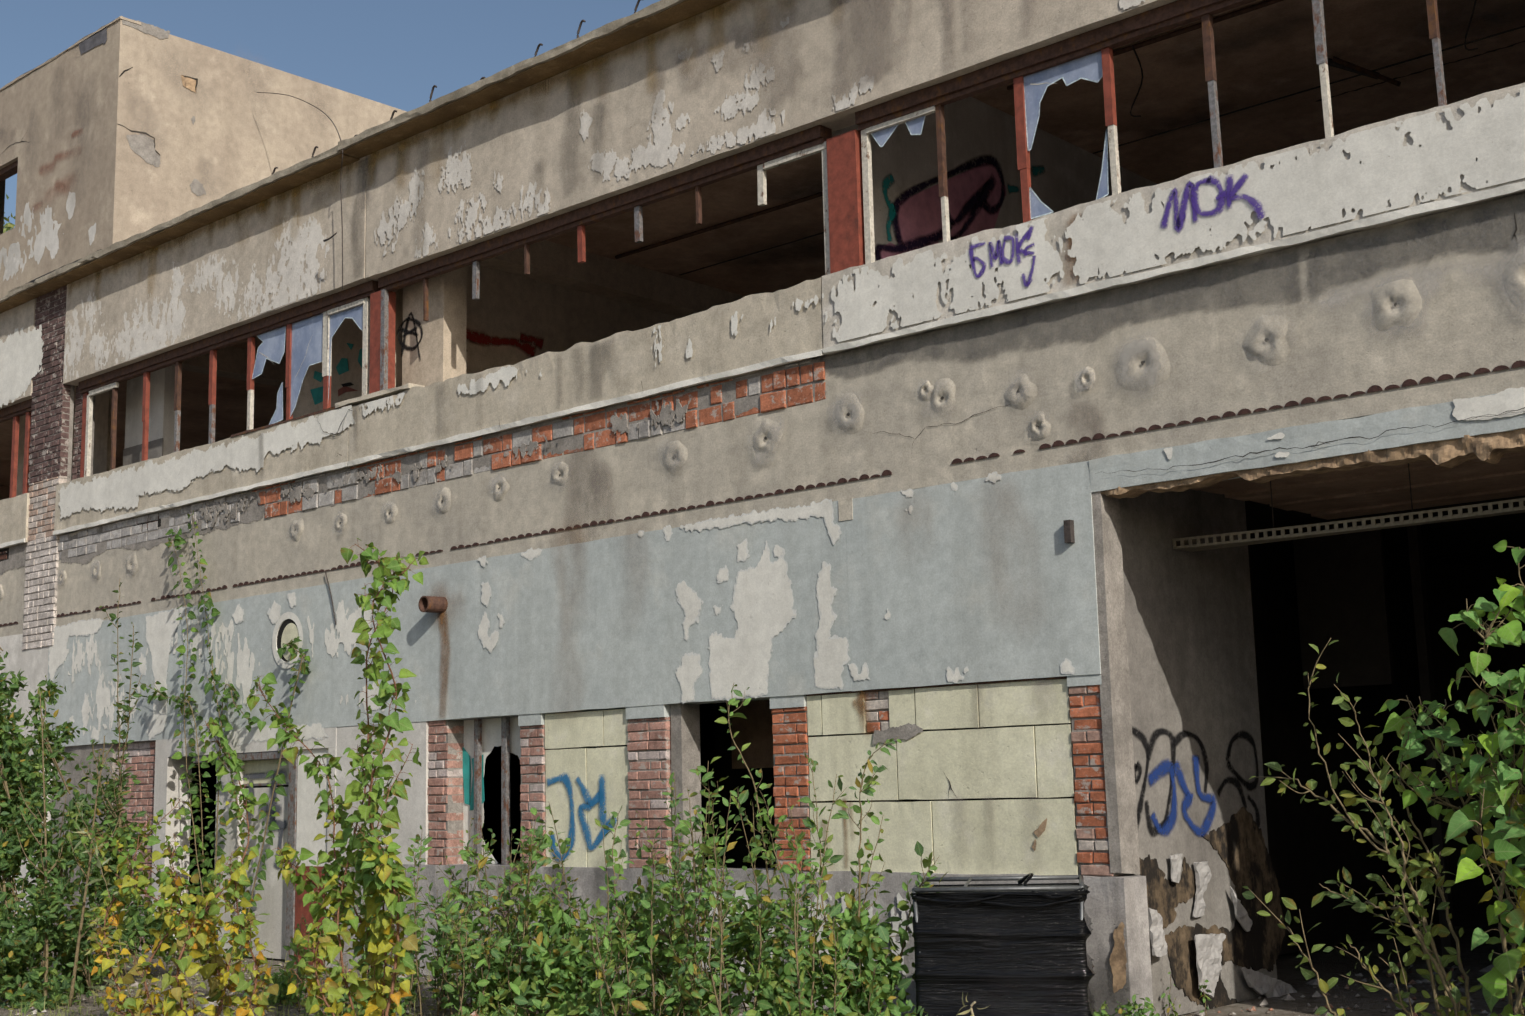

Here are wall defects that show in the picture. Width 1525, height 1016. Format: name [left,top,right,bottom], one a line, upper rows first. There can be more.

peeling [374,140,556,258]
peeling [792,87,1525,342]
peeling [61,207,330,382]
peeling [0,325,44,408]
flaking render [58,355,827,566]
spalling [1101,387,1525,499]
peeling [48,604,262,741]
peeling [267,592,376,658]
corrosion [439,612,449,689]
peeling [662,499,842,704]
peeling [813,561,890,733]
peeling [1139,854,1196,930]